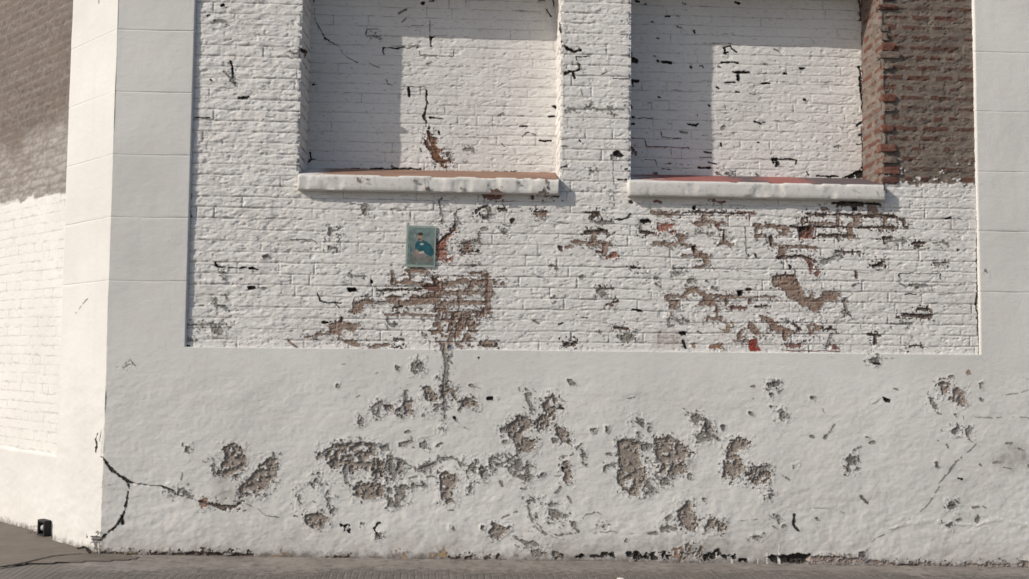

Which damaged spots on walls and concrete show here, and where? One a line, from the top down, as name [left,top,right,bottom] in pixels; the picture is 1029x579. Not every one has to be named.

spalling [927,369,984,448]
crack [0,433,277,567]
spalling [162,474,196,503]
spalling [202,443,281,502]
spalling [436,379,794,562]